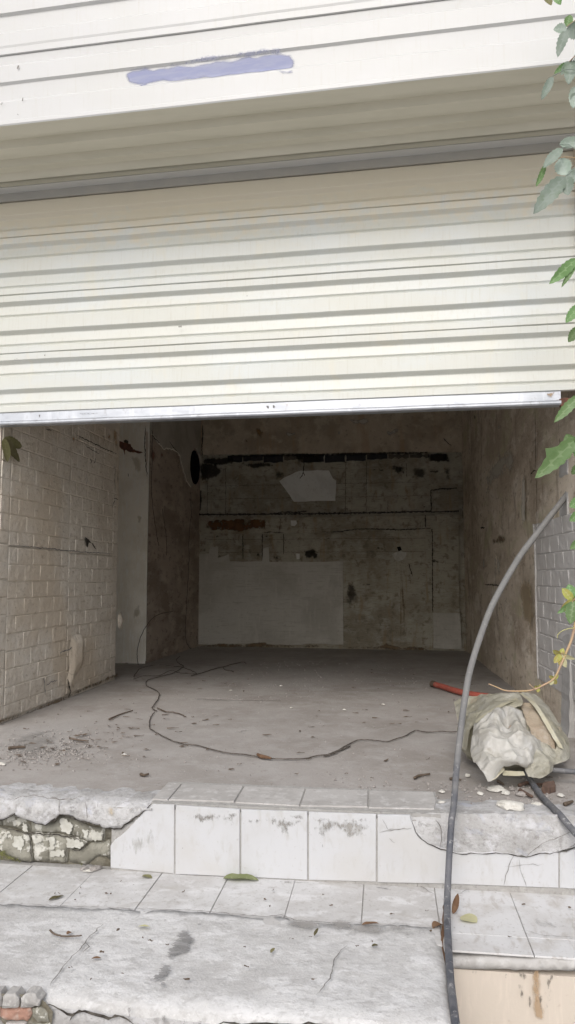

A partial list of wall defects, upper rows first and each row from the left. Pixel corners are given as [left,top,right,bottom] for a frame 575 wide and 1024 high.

spalling [0,815,112,866]
crack [383,817,575,884]
crack [13,903,364,1024]